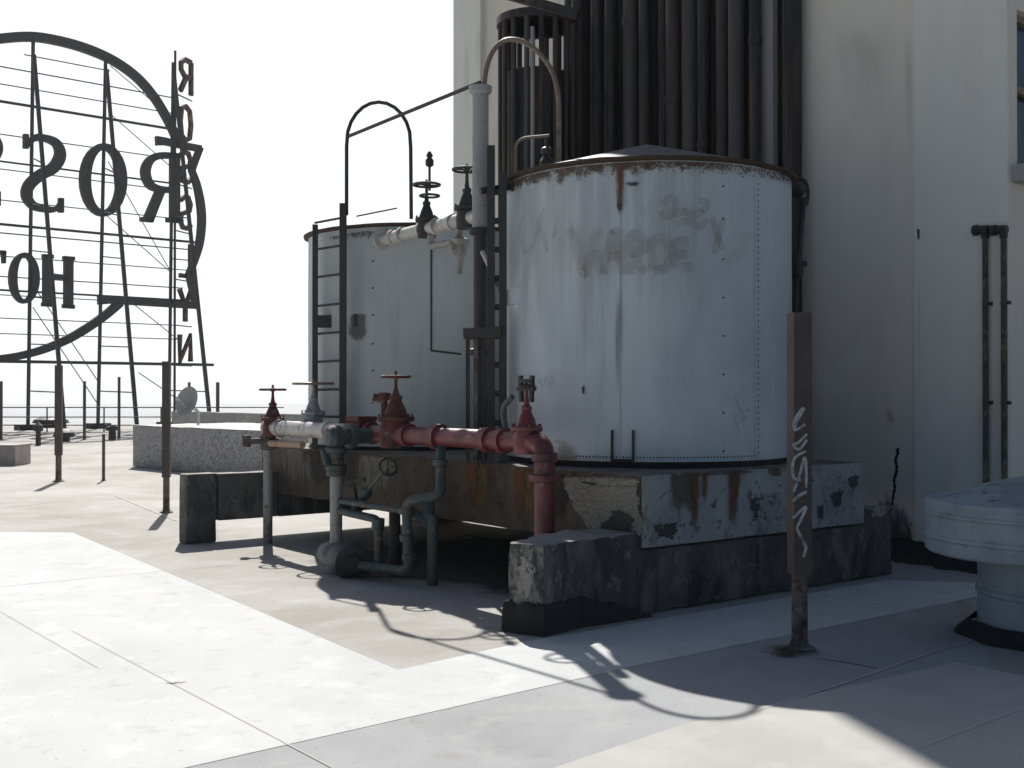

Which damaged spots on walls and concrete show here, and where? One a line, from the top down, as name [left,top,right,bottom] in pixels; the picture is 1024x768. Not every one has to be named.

corrosion [509,161,792,210]
spalling [562,477,683,547]
corrosion [671,470,753,523]
crack [891,448,899,505]